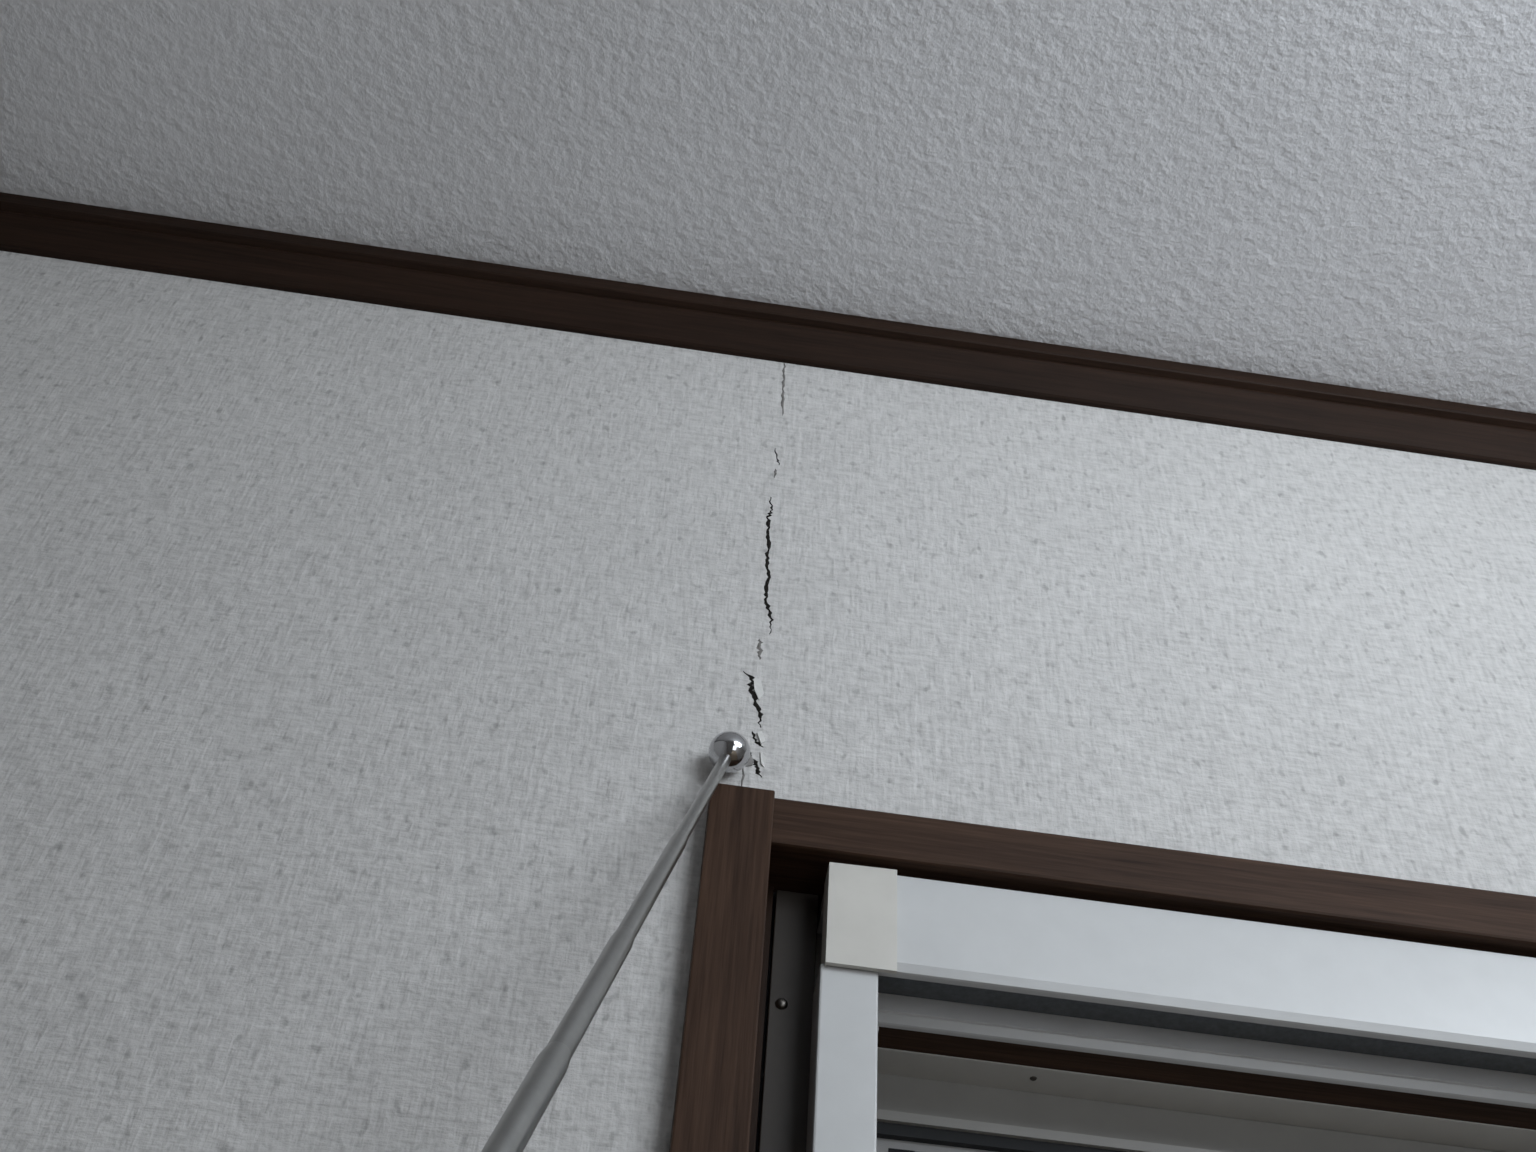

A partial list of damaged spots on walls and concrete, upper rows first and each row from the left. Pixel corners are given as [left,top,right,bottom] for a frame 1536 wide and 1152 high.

crack [741,363,786,786]